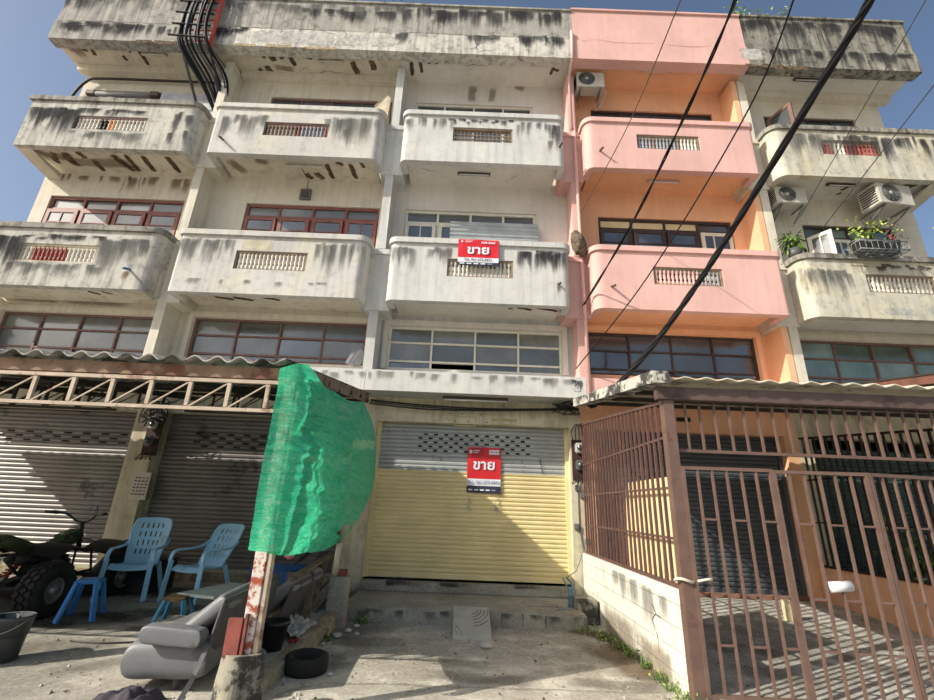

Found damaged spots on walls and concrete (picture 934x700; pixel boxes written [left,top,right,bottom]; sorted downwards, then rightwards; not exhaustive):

damp [60,21,185,33]
damp [216,27,248,35]
damp [742,20,896,39]
damp [770,49,909,62]
damp [30,107,144,129]
damp [167,112,193,140]
damp [843,135,934,157]
damp [0,234,106,260]
damp [518,250,566,268]